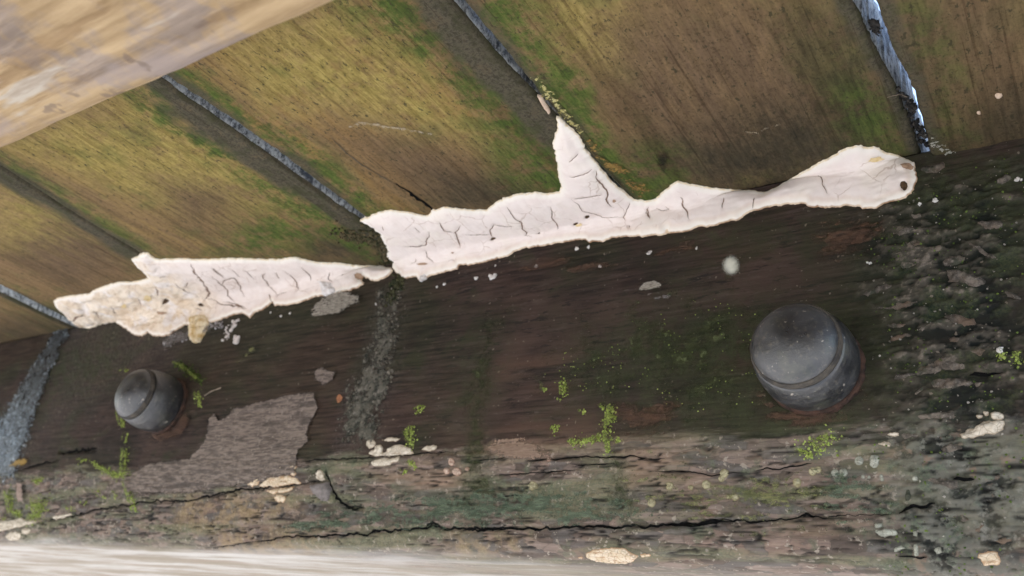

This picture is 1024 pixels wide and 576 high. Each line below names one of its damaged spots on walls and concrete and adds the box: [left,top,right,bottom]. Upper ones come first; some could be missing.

crack [332,138,460,263]
crack [550,154,689,228]
crack [489,208,533,237]
spalling [978,220,1003,230]
spalling [943,255,986,287]
spalling [887,314,976,342]
damp [335,288,406,451]
spalling [894,357,982,395]
peeling [98,367,335,498]
spalling [918,411,956,419]
crack [954,475,974,483]
crack [41,451,935,549]